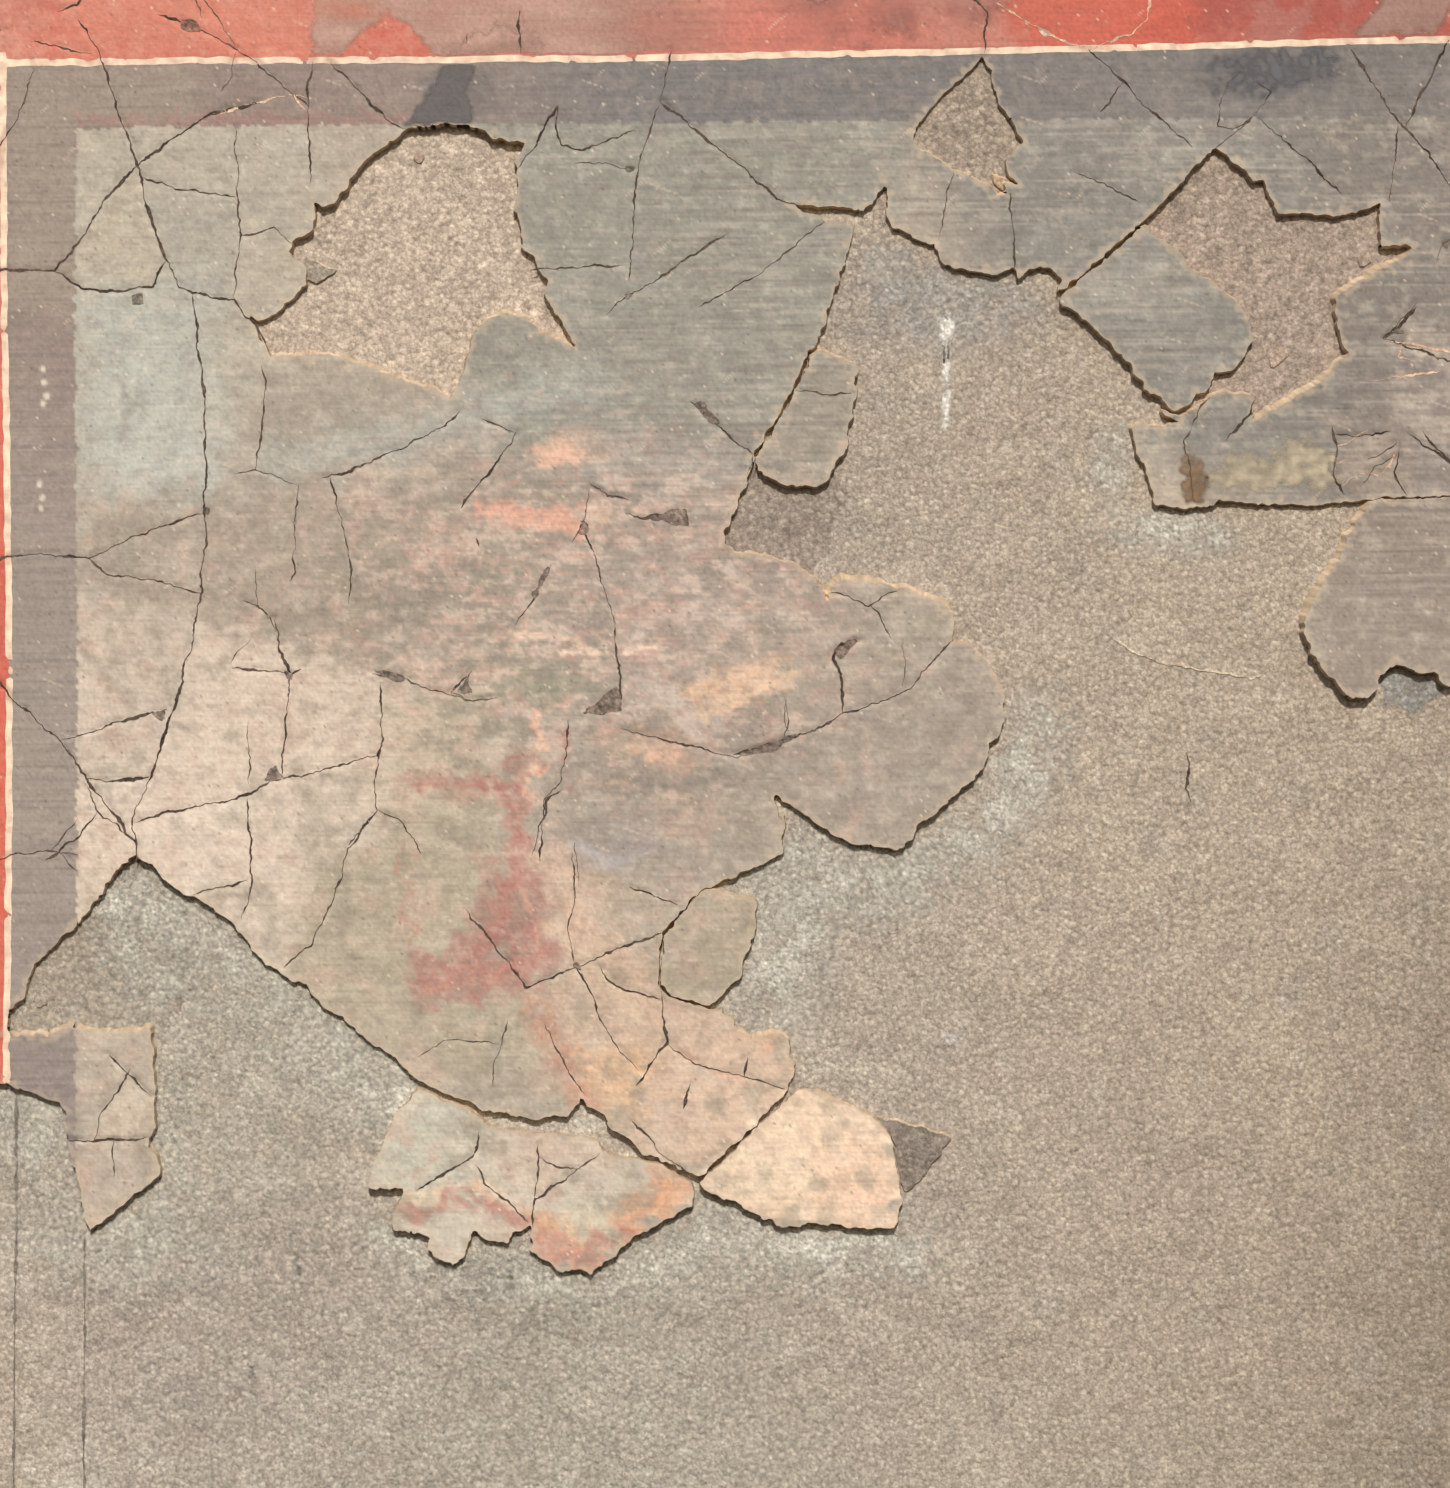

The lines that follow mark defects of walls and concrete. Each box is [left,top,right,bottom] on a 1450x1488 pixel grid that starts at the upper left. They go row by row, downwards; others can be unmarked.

spalling [251,122,571,396]
crack [517,51,824,310]
spalling [914,60,1022,194]
crack [973,0,1341,193]
spalling [1140,151,1407,419]
crack [0,0,516,966]
spalling [724,453,848,575]
crack [1332,427,1450,495]
crack [468,483,950,1109]
spalling [7,857,251,1032]
crack [68,1055,151,1173]
crack [418,1135,598,1227]